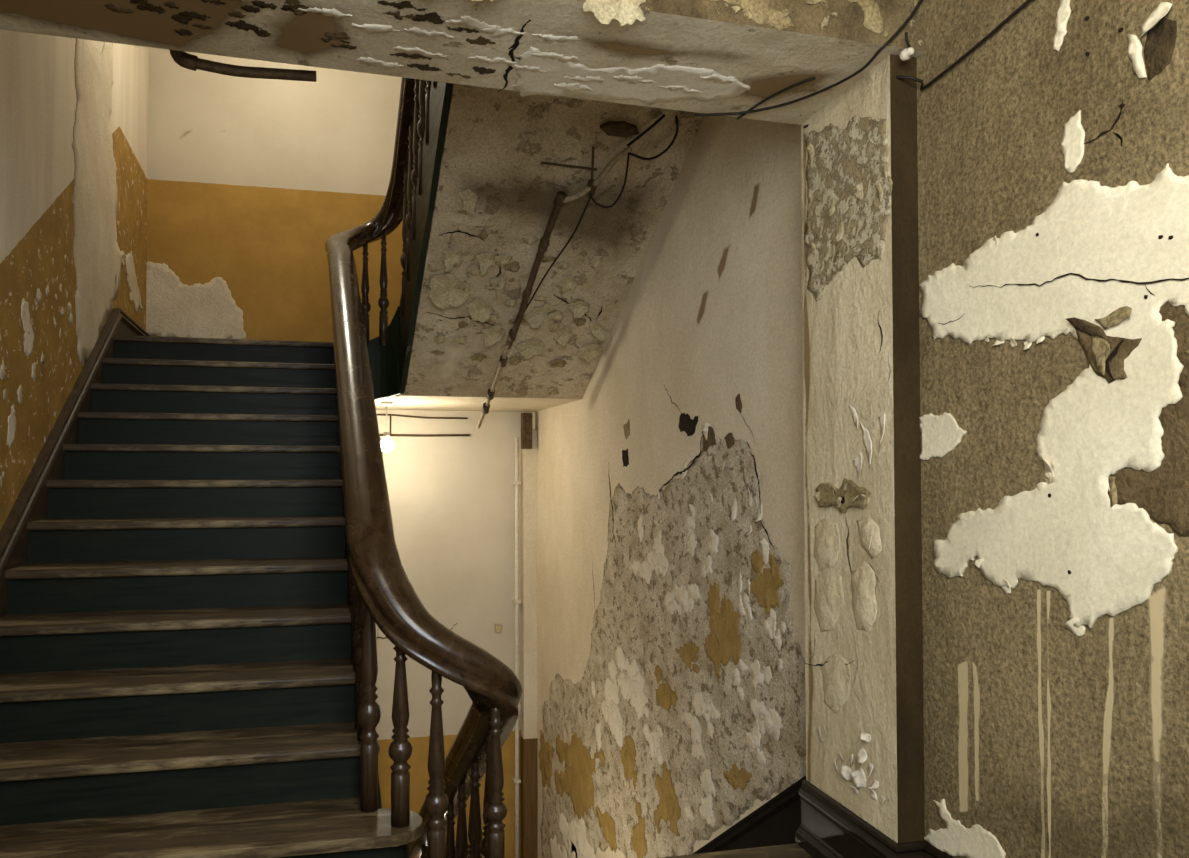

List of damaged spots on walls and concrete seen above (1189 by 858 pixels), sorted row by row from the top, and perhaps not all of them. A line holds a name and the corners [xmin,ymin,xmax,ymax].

peeling [104,0,750,103]
crack [497,20,531,92]
peeling [1128,2,1177,81]
peeling [0,38,246,449]
peeling [919,110,1189,637]
crack [970,273,1189,295]
peeling [540,413,824,858]
peeling [924,799,1006,858]
damp [958,661,980,812]
damp [1037,589,1051,858]
damp [1101,618,1114,858]
damp [1149,587,1166,858]